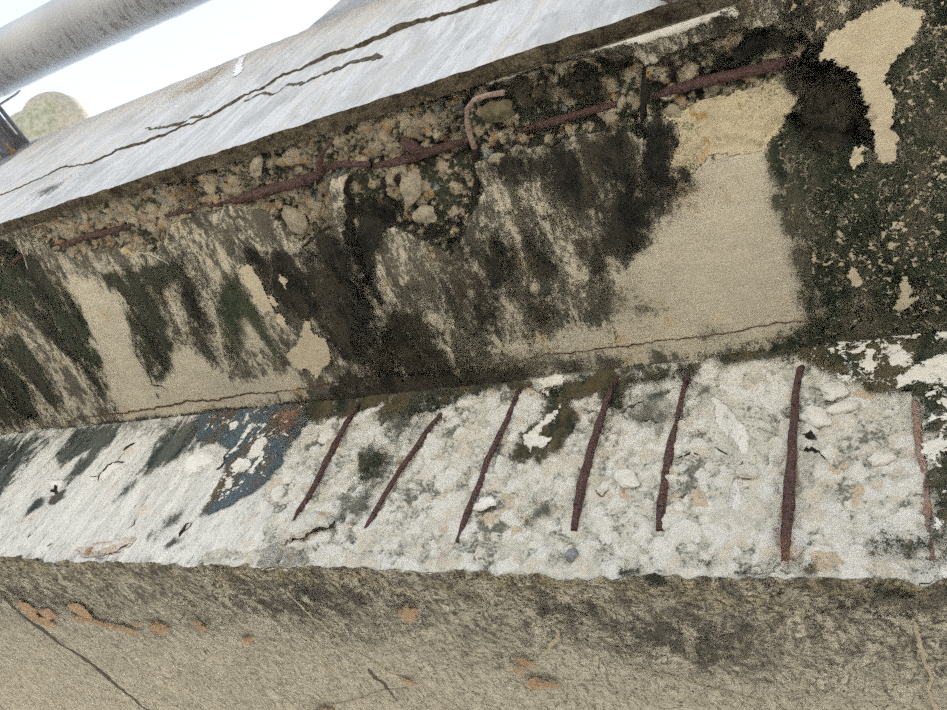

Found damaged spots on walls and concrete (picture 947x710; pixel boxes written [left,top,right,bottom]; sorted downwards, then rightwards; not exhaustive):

crack [0,0,498,196]
peeling [286,321,331,379]
leakage [0,0,947,523]
spalling [30,0,947,260]
peeling [811,121,947,318]
rust [438,387,523,560]
leakage [520,495,557,529]
spalling [198,330,947,585]
rust [571,376,619,531]
rust [656,372,690,532]
rust [773,365,805,564]
crack [2,596,147,710]